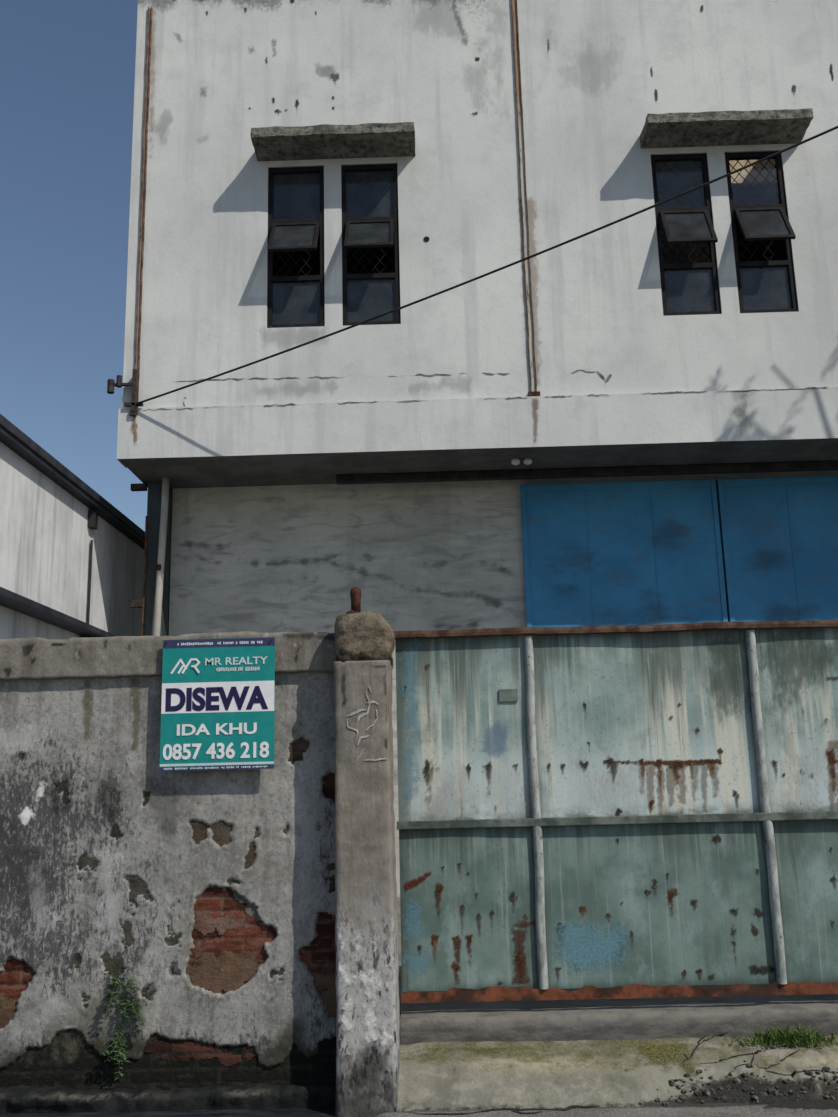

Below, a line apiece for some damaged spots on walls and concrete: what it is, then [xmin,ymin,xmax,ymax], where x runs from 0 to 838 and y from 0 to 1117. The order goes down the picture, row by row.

spalling [288,737,310,764]
rust [603,748,723,783]
rust [826,749,838,795]
leakage [19,782,44,825]
spalling [189,820,232,847]
spalling [164,828,285,994]
rust [404,866,444,915]
rust [418,905,495,981]
rust [498,892,536,984]
spalling [0,912,393,1090]
crack [682,1030,838,1078]